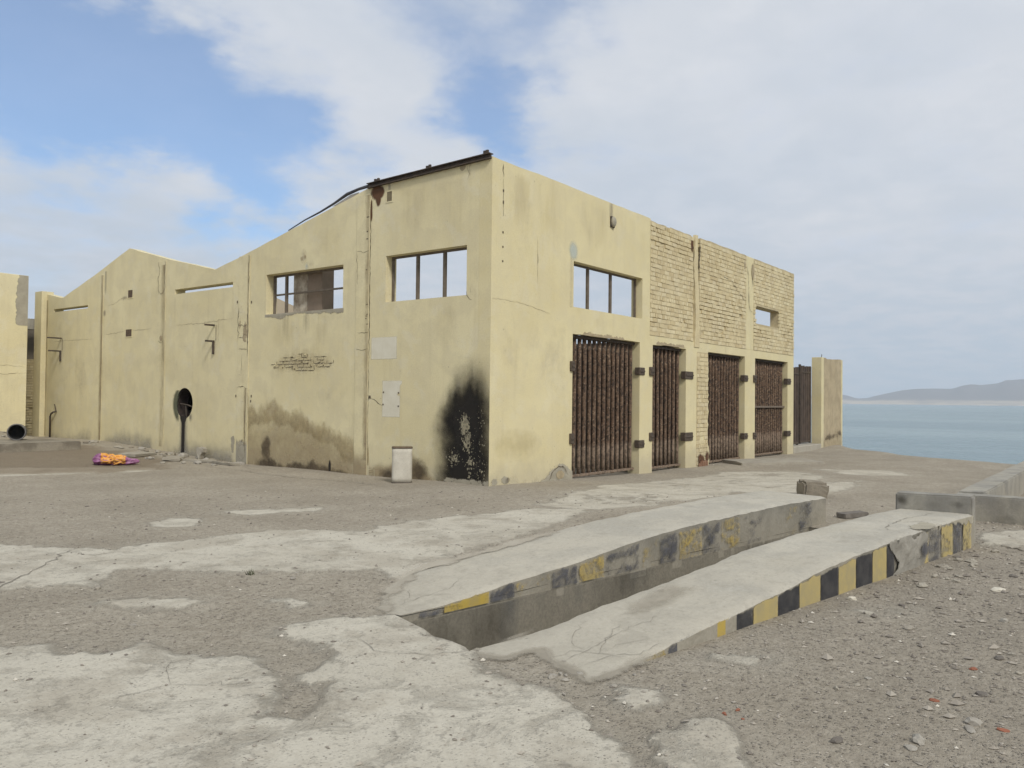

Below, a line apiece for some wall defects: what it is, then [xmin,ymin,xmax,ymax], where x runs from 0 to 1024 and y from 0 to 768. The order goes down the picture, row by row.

corrosion [370,186,384,220]
damp [247,436,392,478]
damp [412,460,429,480]
spalling [890,531,931,576]
spalling [410,527,818,651]